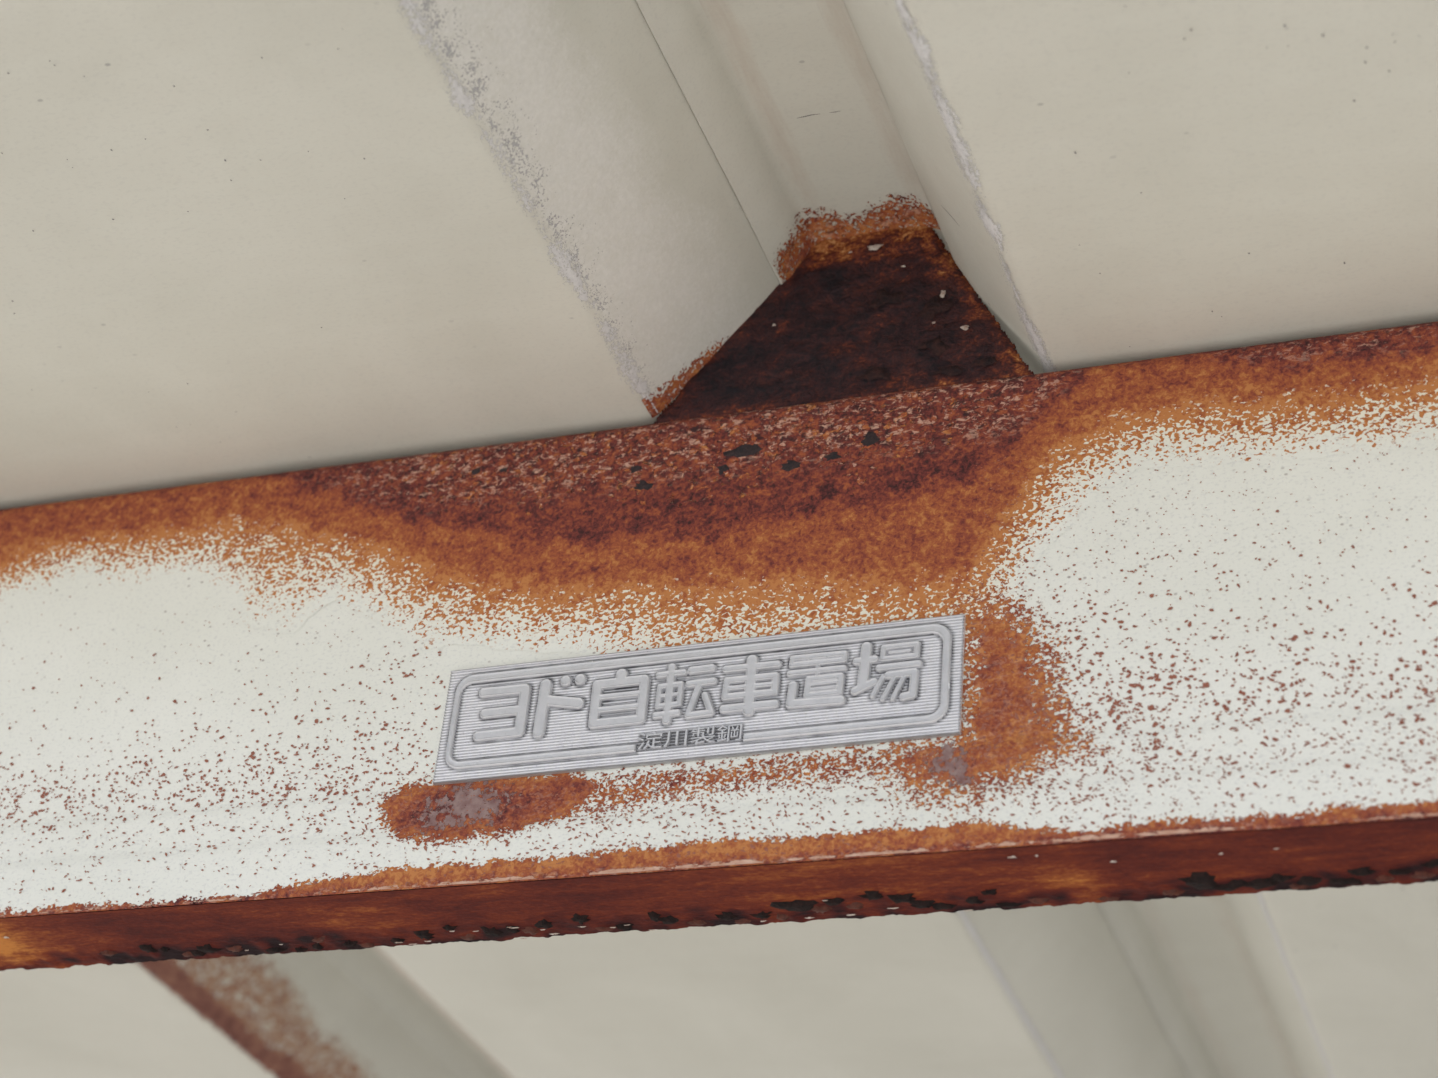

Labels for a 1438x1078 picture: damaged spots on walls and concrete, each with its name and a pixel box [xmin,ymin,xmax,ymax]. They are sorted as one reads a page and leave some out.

rust [773,194,947,283]
rust [0,321,1438,918]
rust [343,919,560,948]
rust [571,913,634,932]
rust [647,889,1050,931]
rust [138,936,379,1078]